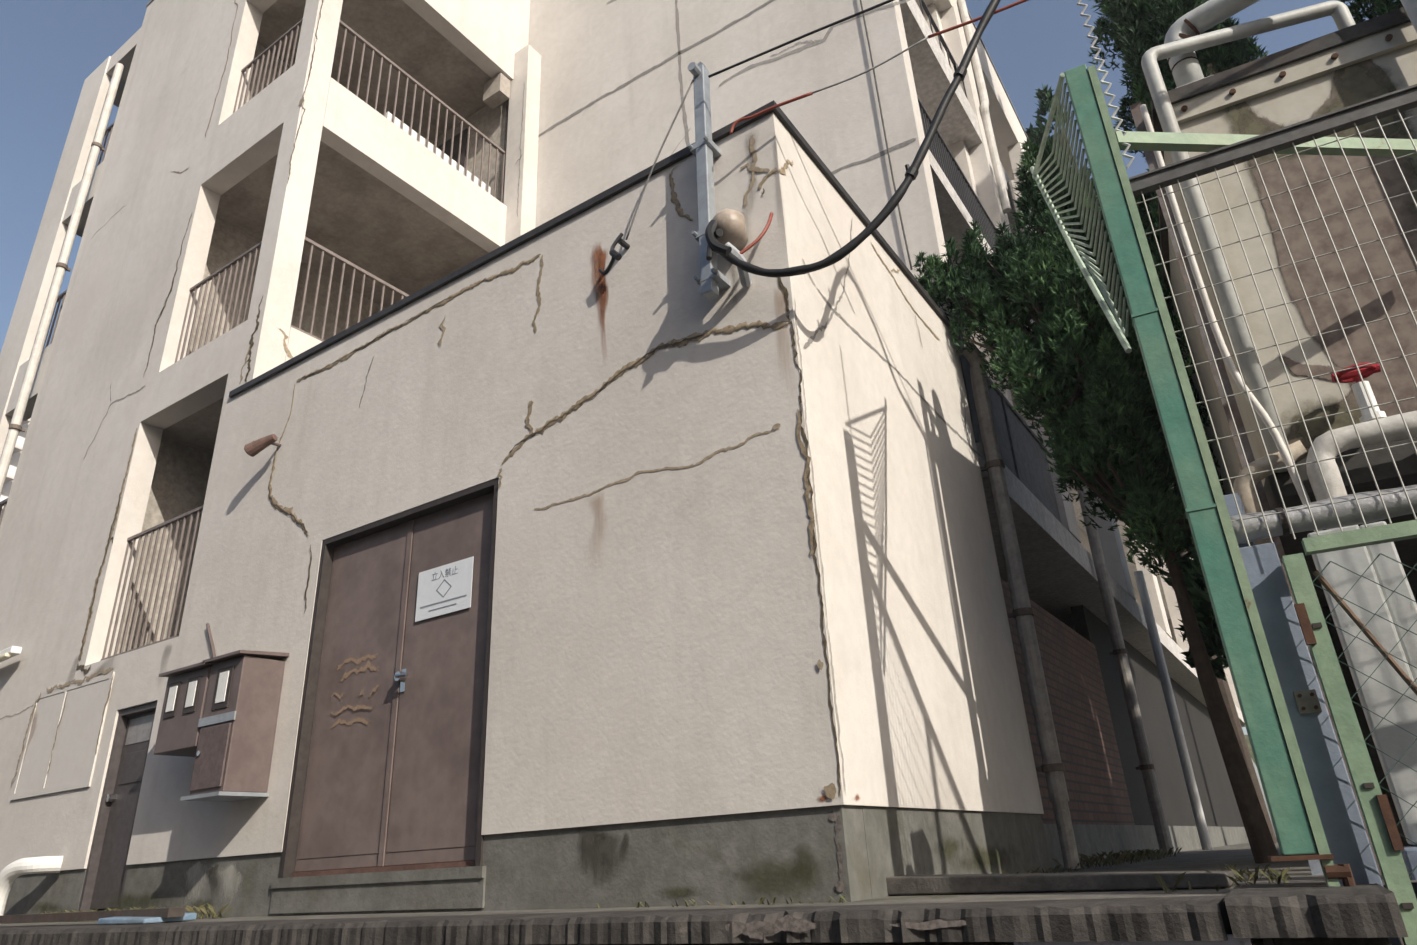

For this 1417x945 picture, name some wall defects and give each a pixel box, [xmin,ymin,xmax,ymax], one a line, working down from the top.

crack [719,0,910,86]
crack [173,3,238,174]
crack [516,0,774,221]
crack [741,159,793,194]
crack [831,138,916,174]
rust [592,247,606,326]
crack [71,212,193,684]
crack [240,254,544,613]
crack [497,224,982,893]
spalling [725,914,816,940]
spalling [888,919,966,930]